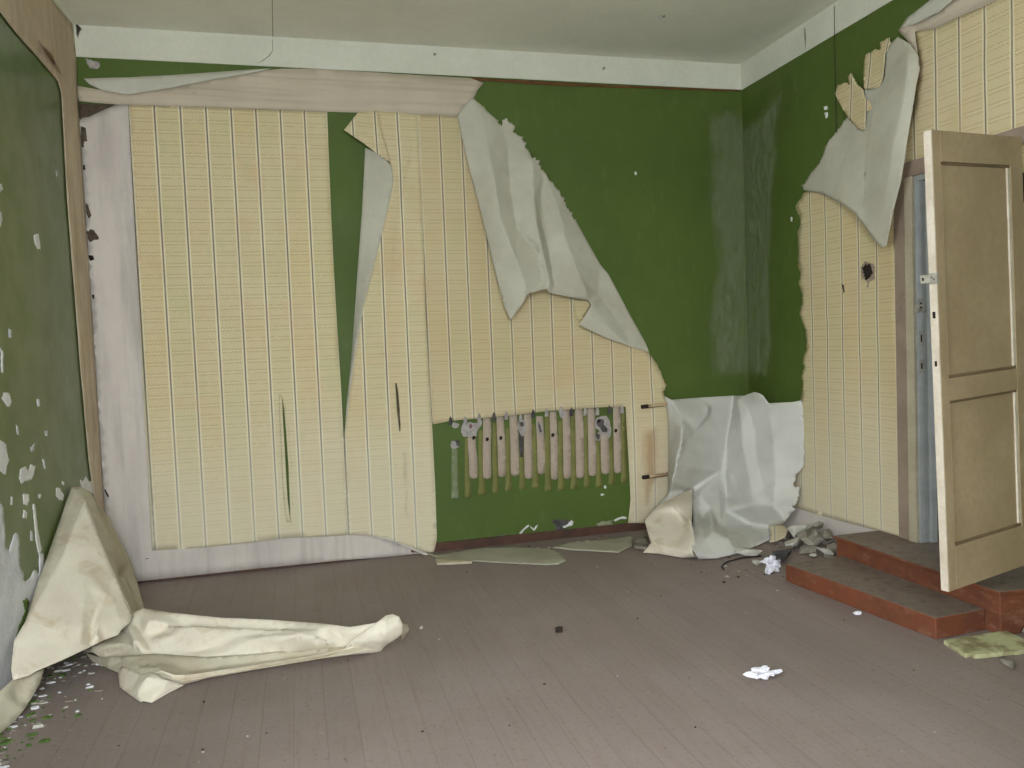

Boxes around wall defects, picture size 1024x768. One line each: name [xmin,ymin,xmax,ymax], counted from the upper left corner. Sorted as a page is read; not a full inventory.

spalling [861,261,876,288]
peeling [2,392,12,407]
spalling [451,420,482,449]
spalling [595,416,611,441]
peeling [80,476,93,494]
spalling [552,519,573,530]
peeling [0,440,46,691]